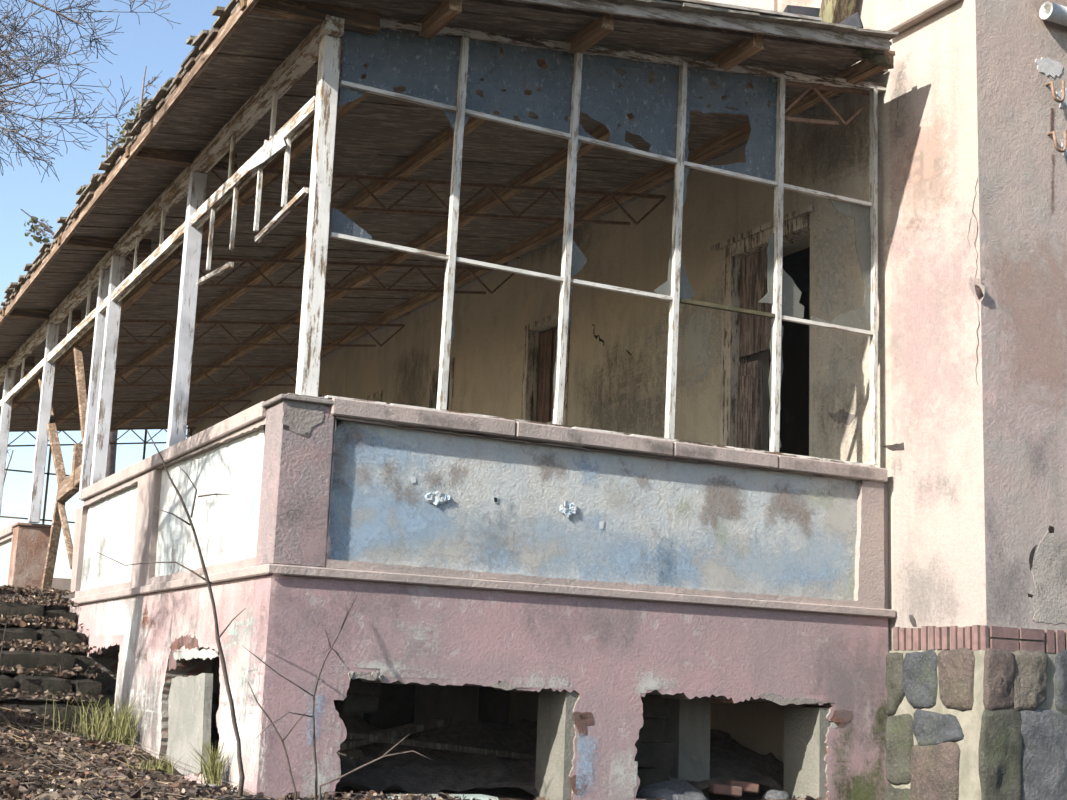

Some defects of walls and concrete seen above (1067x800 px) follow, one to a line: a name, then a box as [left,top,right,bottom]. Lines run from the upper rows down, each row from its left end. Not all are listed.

crack [967,178,980,384]
peeling [384,465,458,506]
peeling [559,501,578,518]
spalling [1028,525,1067,625]
spalling [169,637,219,671]
spalling [348,660,409,681]
peeling [304,752,339,796]